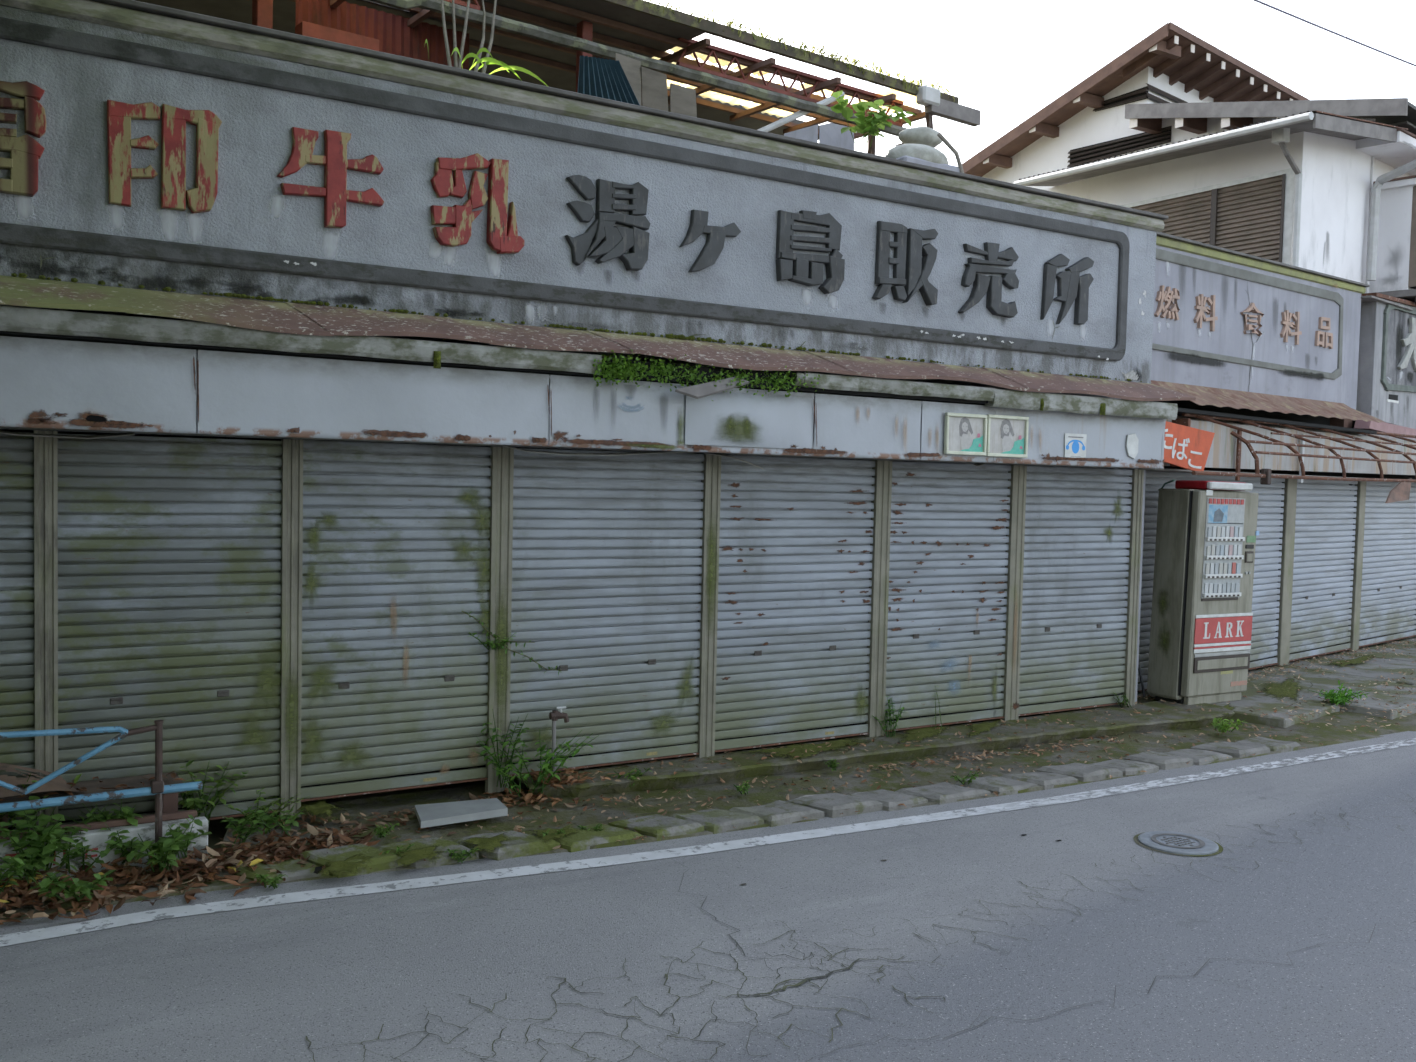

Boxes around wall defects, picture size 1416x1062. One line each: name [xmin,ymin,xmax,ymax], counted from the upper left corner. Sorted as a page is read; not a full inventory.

water stain [164,212,200,240]
water stain [0,256,209,290]
water stain [309,296,370,305]
water stain [438,309,482,317]
rust [28,410,154,429]
rust [362,430,427,438]
rust [892,433,941,486]
rust [730,483,771,521]
rust [888,500,1009,631]